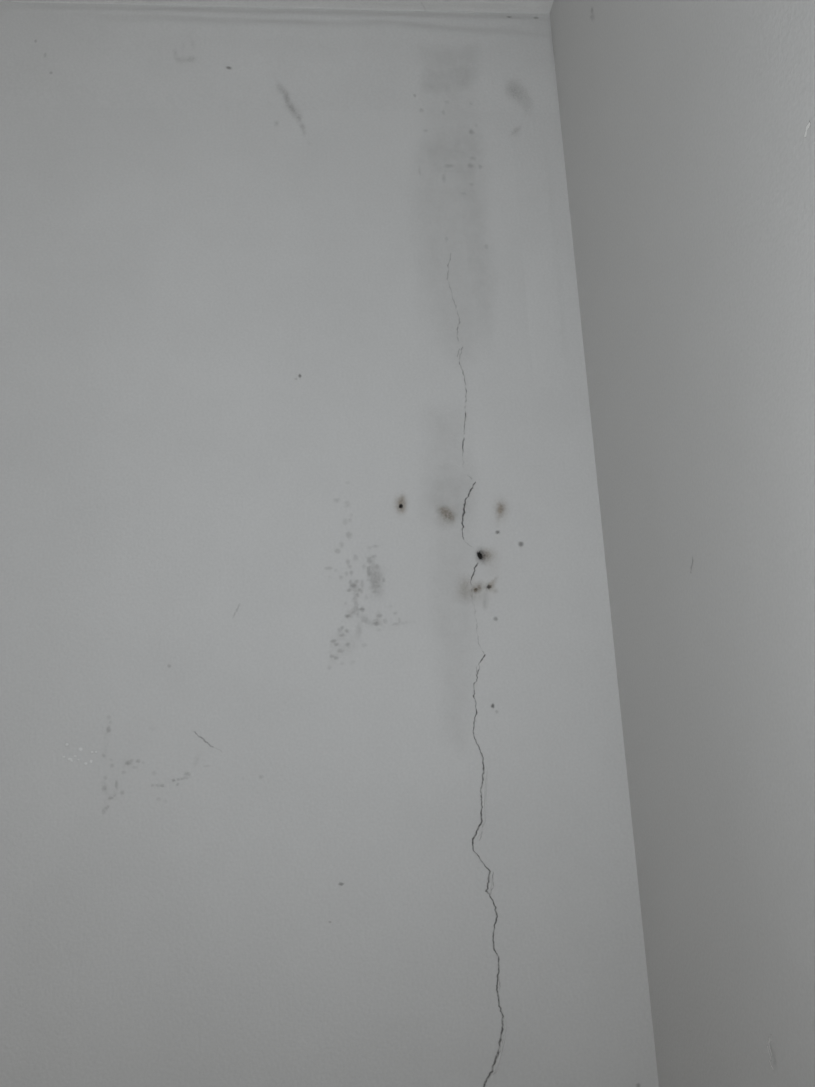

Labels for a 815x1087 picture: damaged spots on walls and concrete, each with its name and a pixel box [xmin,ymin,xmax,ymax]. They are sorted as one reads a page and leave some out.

crack [462,483,475,534]
crack [472,659,507,1087]